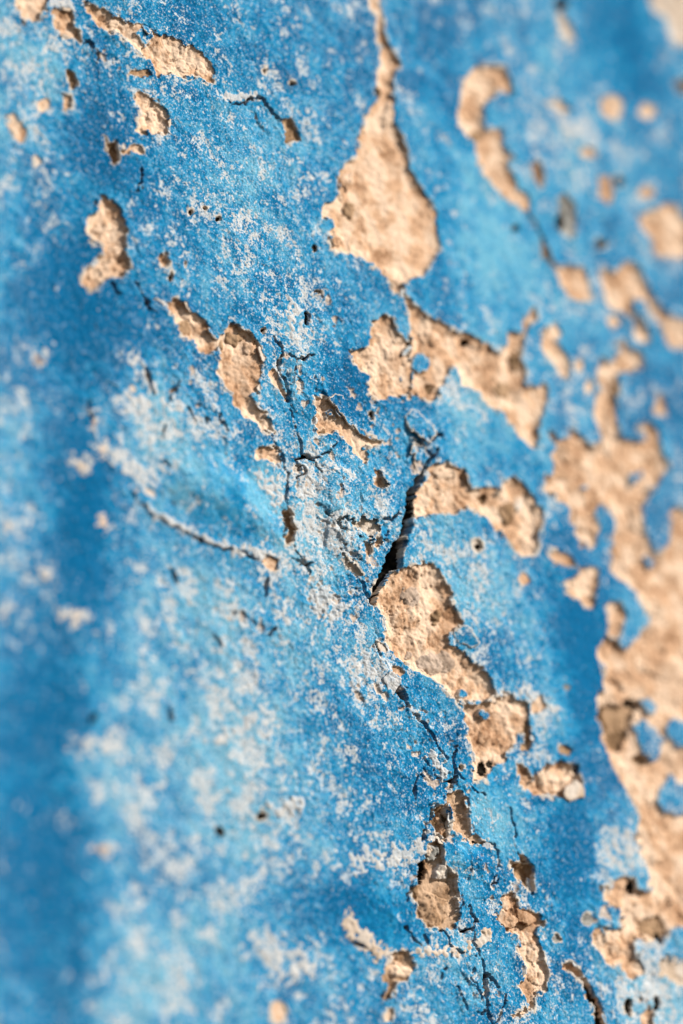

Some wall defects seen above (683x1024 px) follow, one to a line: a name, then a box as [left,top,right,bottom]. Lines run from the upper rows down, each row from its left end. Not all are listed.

peeling [15,0,214,164]
peeling [81,195,129,294]
peeling [153,299,271,431]
crack [268,358,305,401]
crack [368,408,437,605]
peeling [311,0,683,980]
crack [424,749,452,783]
peeling [497,893,549,1020]
peeling [659,955,683,986]